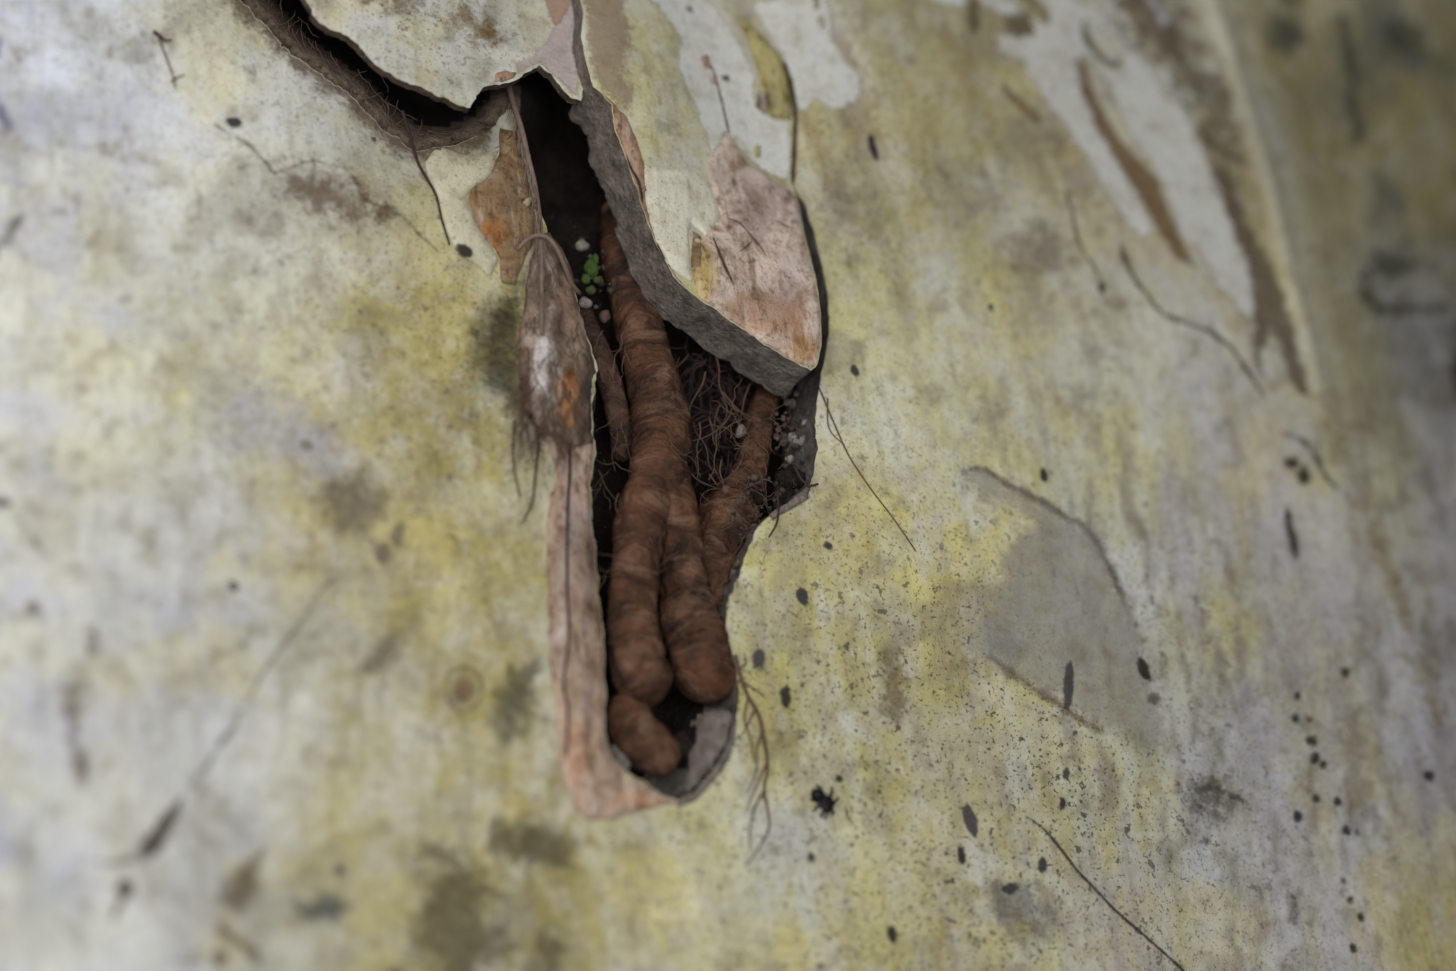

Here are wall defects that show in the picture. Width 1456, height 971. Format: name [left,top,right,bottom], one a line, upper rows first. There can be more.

peeling [226,117,241,127]
crack [234,0,555,160]
peeling [932,0,1256,330]
spalling [300,0,860,820]